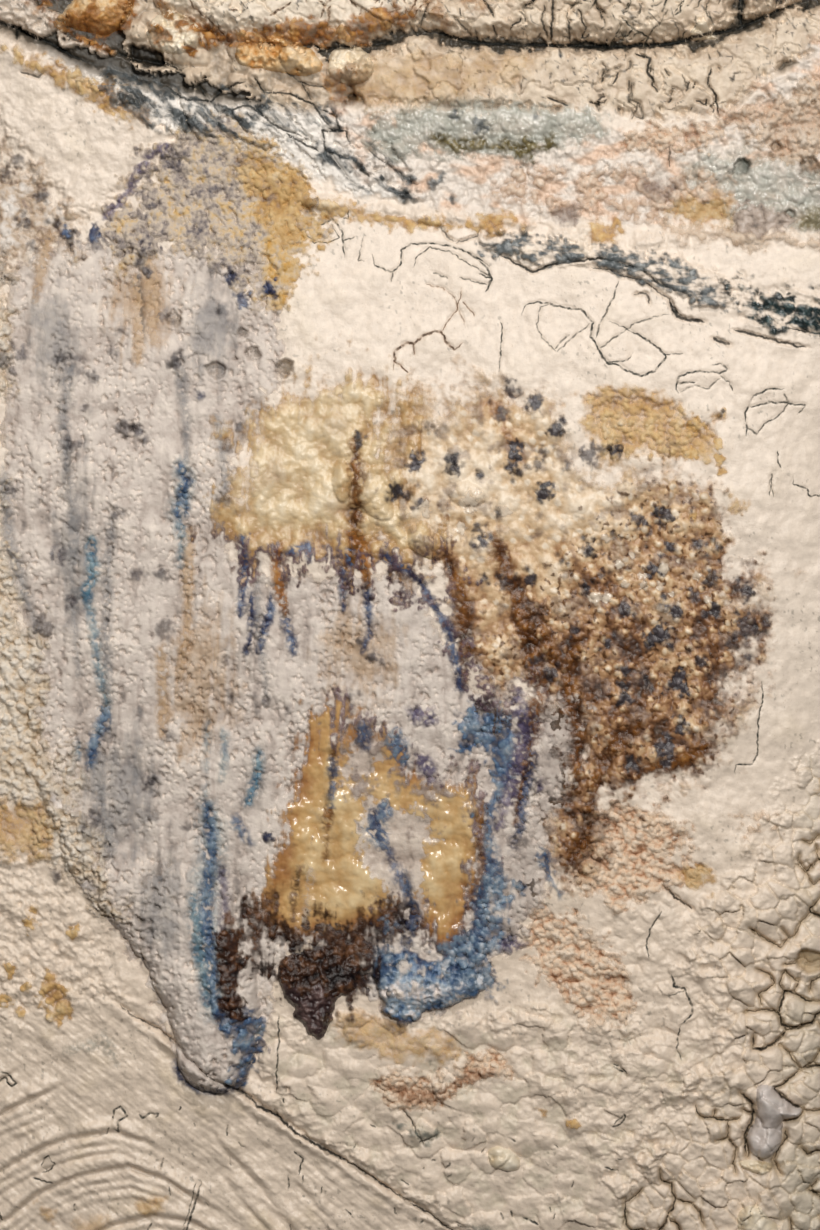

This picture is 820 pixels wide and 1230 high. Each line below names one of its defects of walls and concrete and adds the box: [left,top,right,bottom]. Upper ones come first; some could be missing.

corrosion [38,0,136,54]
crack [115,51,405,177]
corrosion [148,0,415,57]
crack [320,0,808,119]
crack [305,211,820,497]
damp [83,537,111,765]
damp [174,368,771,1094]
damp [22,907,37,929]
damp [0,963,73,1026]
damp [66,924,79,940]
crack [695,899,820,1197]
crack [123,1008,461,1230]